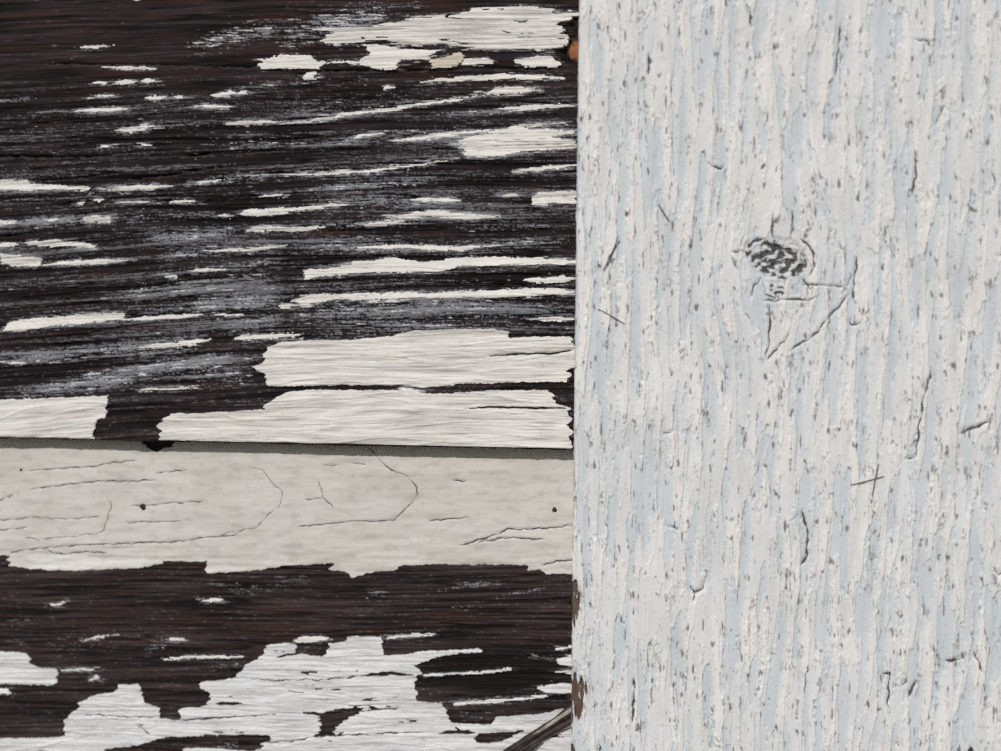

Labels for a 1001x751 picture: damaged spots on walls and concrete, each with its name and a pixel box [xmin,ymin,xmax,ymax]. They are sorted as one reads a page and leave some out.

peeling [75,66,157,112]
peeling [226,6,579,127]
peeling [284,122,577,176]
peeling [0,179,173,205]
peeling [218,194,351,232]
peeling [364,197,501,227]
peeling [0,240,128,267]
peeling [278,244,576,309]
peeling [3,312,203,332]
crack [0,446,418,555]
crack [461,524,573,545]
peeling [0,633,587,751]